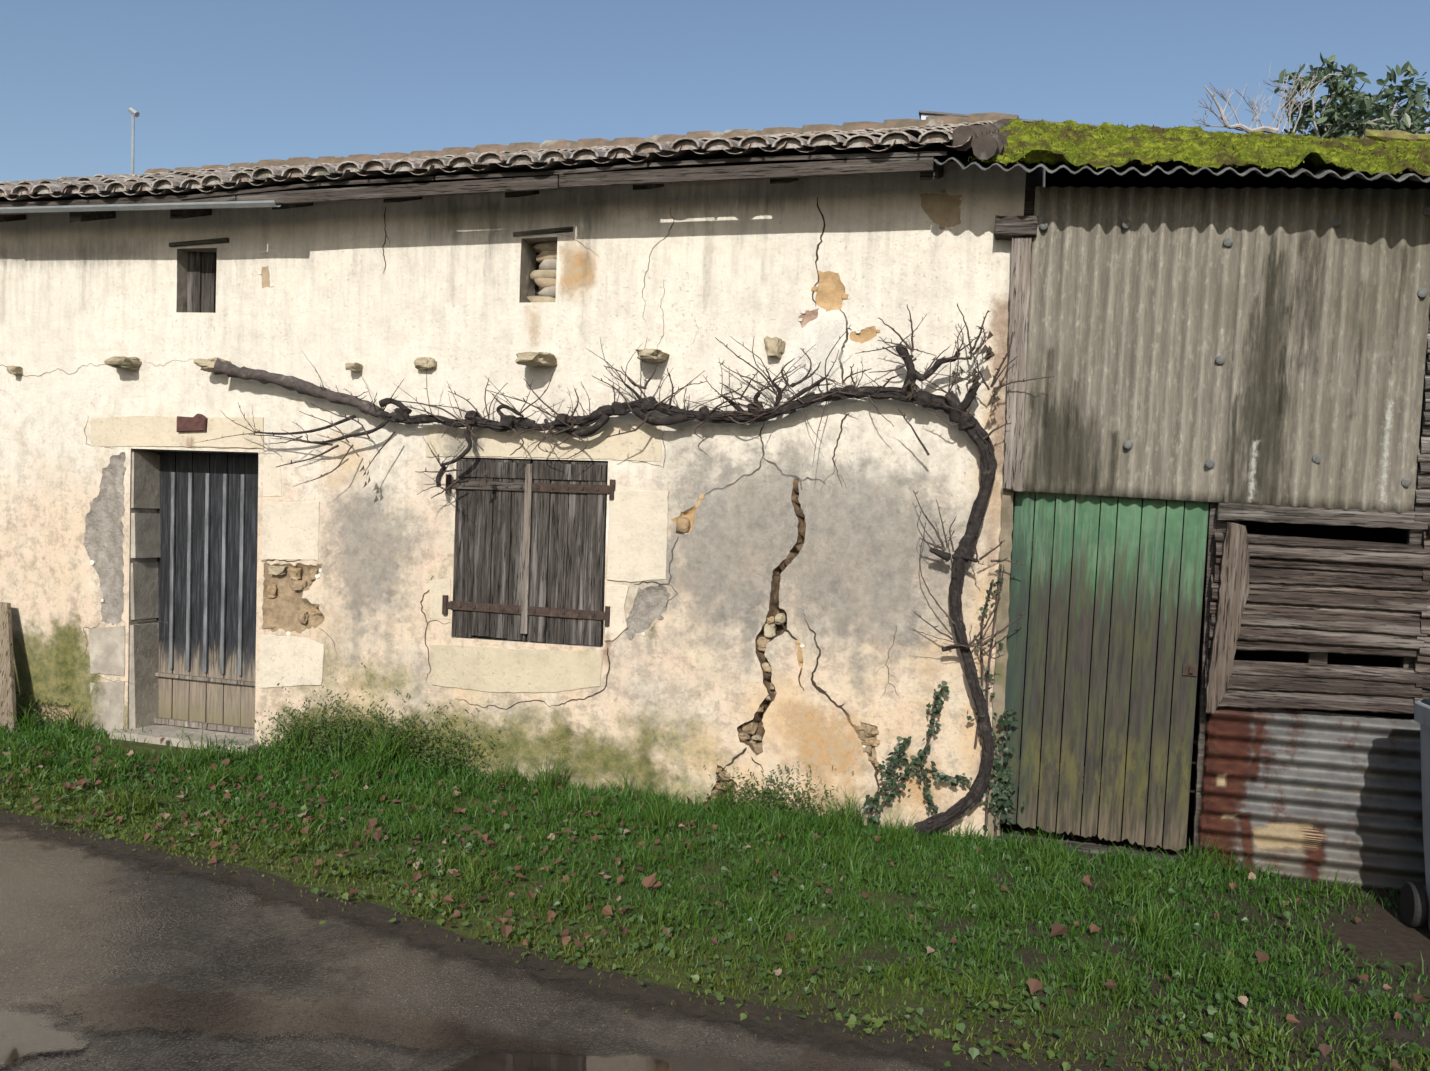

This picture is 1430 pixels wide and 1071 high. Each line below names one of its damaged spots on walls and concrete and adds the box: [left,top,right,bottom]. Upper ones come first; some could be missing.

peeling [920,189,964,230]
peeling [798,271,849,328]
damp [1228,239,1318,502]
spalling [83,452,126,625]
spalling [262,562,325,637]
spalling [624,585,671,641]
crack [879,625,898,697]
crack [781,613,880,791]
corrosion [1199,714,1265,874]
corrosion [1303,827,1325,882]